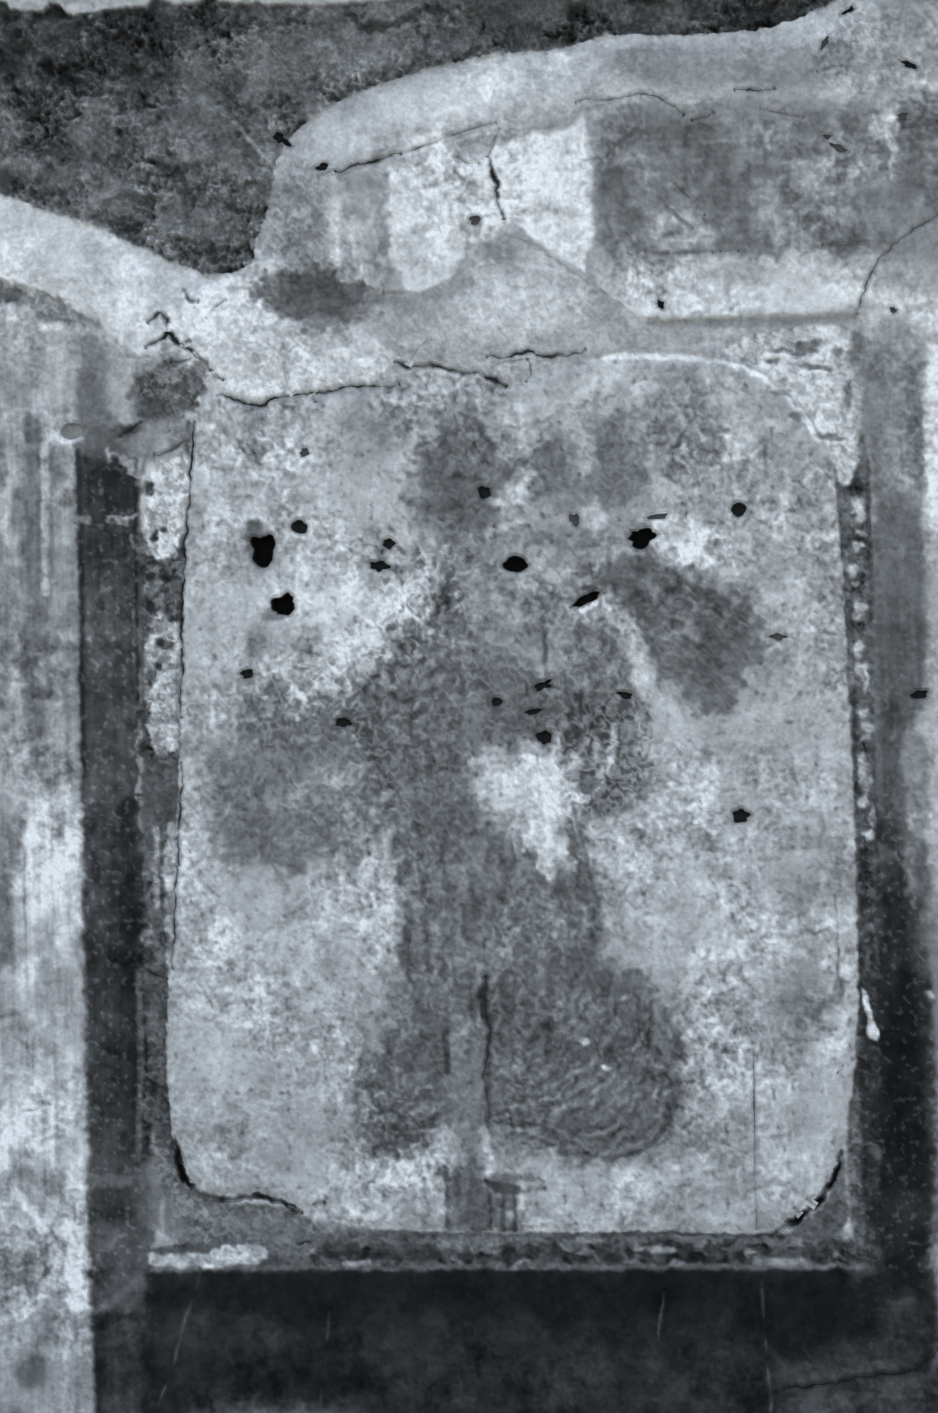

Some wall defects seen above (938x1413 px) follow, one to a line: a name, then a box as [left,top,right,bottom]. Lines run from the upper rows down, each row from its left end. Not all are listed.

crack [575,85,803,123]
crack [319,120,507,218]
flaking render [0,0,836,341]
crack [646,183,738,257]
crack [823,209,938,313]
flaking render [722,324,864,487]
flaking render [126,357,207,563]
spalling [241,519,268,542]
flaking render [143,607,180,759]
crack [172,1140,324,1215]
crack [744,1278,938,1413]